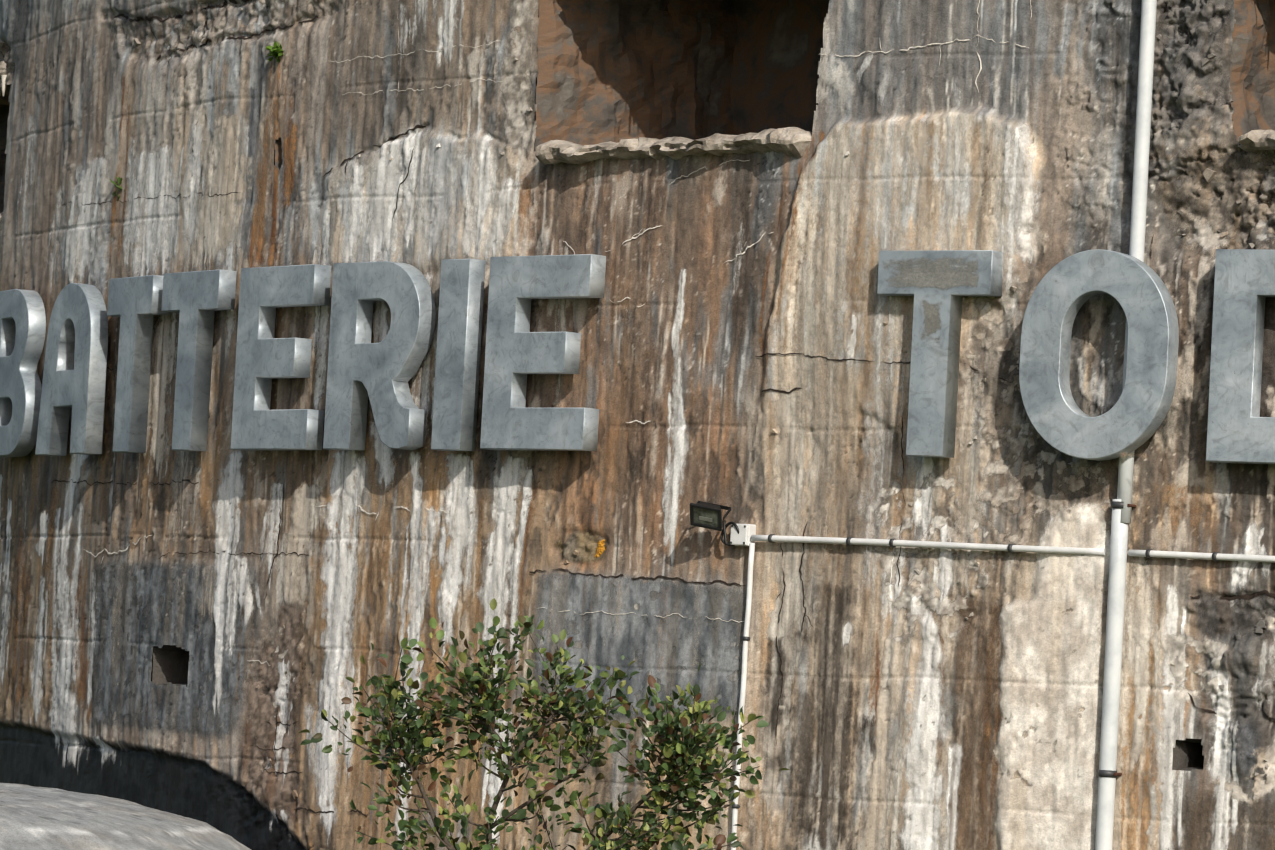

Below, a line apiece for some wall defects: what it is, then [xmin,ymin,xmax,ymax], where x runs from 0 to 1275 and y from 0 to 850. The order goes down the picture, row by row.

crack [331,0,504,95]
crack [821,0,1029,92]
spalling [1152,0,1230,131]
crack [322,125,426,218]
spalling [1151,139,1275,257]
water stain [756,82,1007,850]
water stain [0,454,115,766]
water stain [193,422,394,841]
rust [346,520,397,849]
water stain [395,326,532,849]
rust [473,500,484,674]
peeling [1214,725,1275,804]